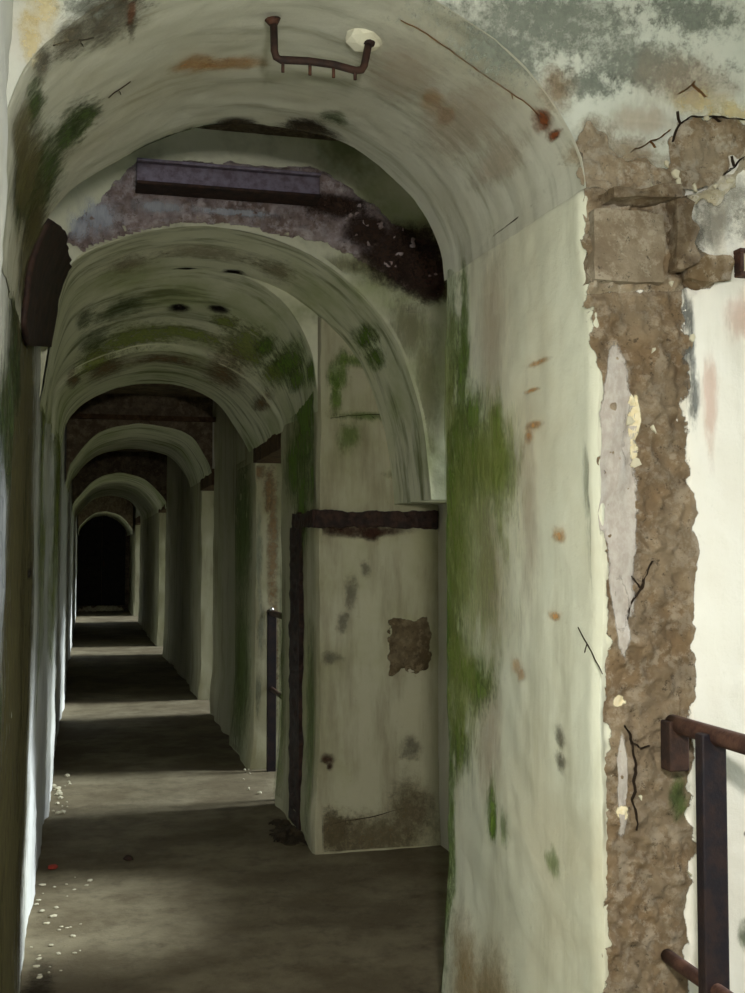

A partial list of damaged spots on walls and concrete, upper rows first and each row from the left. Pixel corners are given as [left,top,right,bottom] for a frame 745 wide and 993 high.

spalling [286,119,337,138]
rust [535,110,559,140]
crack [631,81,745,152]
crack [724,156,745,175]
spalling [67,160,415,267]
water stain [0,107,50,993]
spalling [576,116,745,993]
spalling [387,617,432,676]
crack [578,627,603,674]
water stain [322,783,433,851]